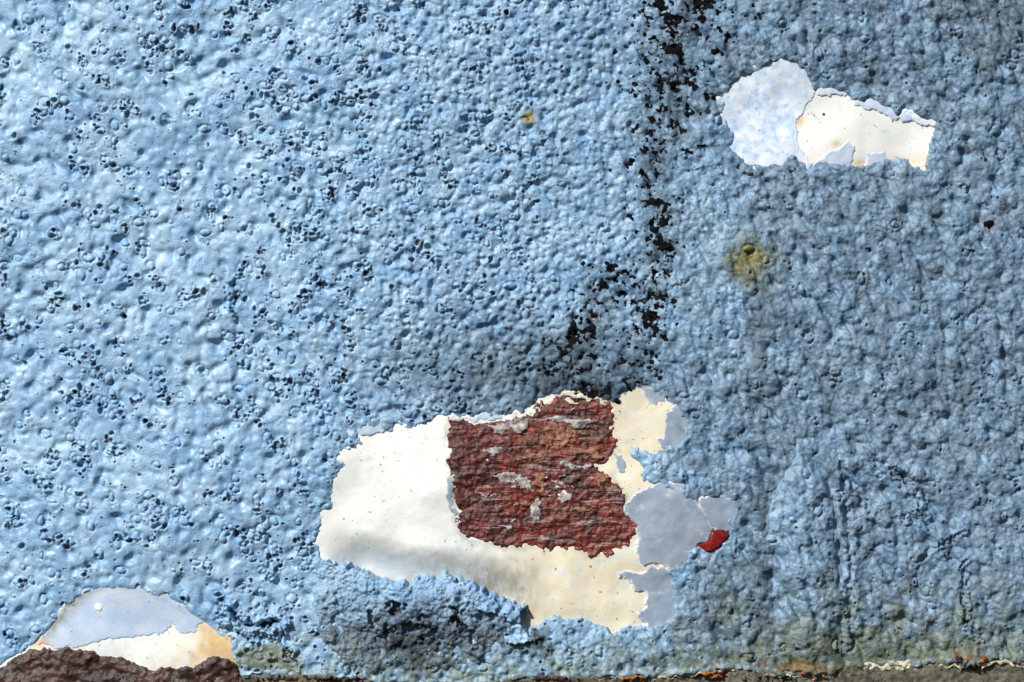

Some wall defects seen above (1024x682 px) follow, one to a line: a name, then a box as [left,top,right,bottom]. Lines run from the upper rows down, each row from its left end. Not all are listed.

peeling [716,58,936,171]
peeling [312,385,738,634]
peeling [0,585,298,673]